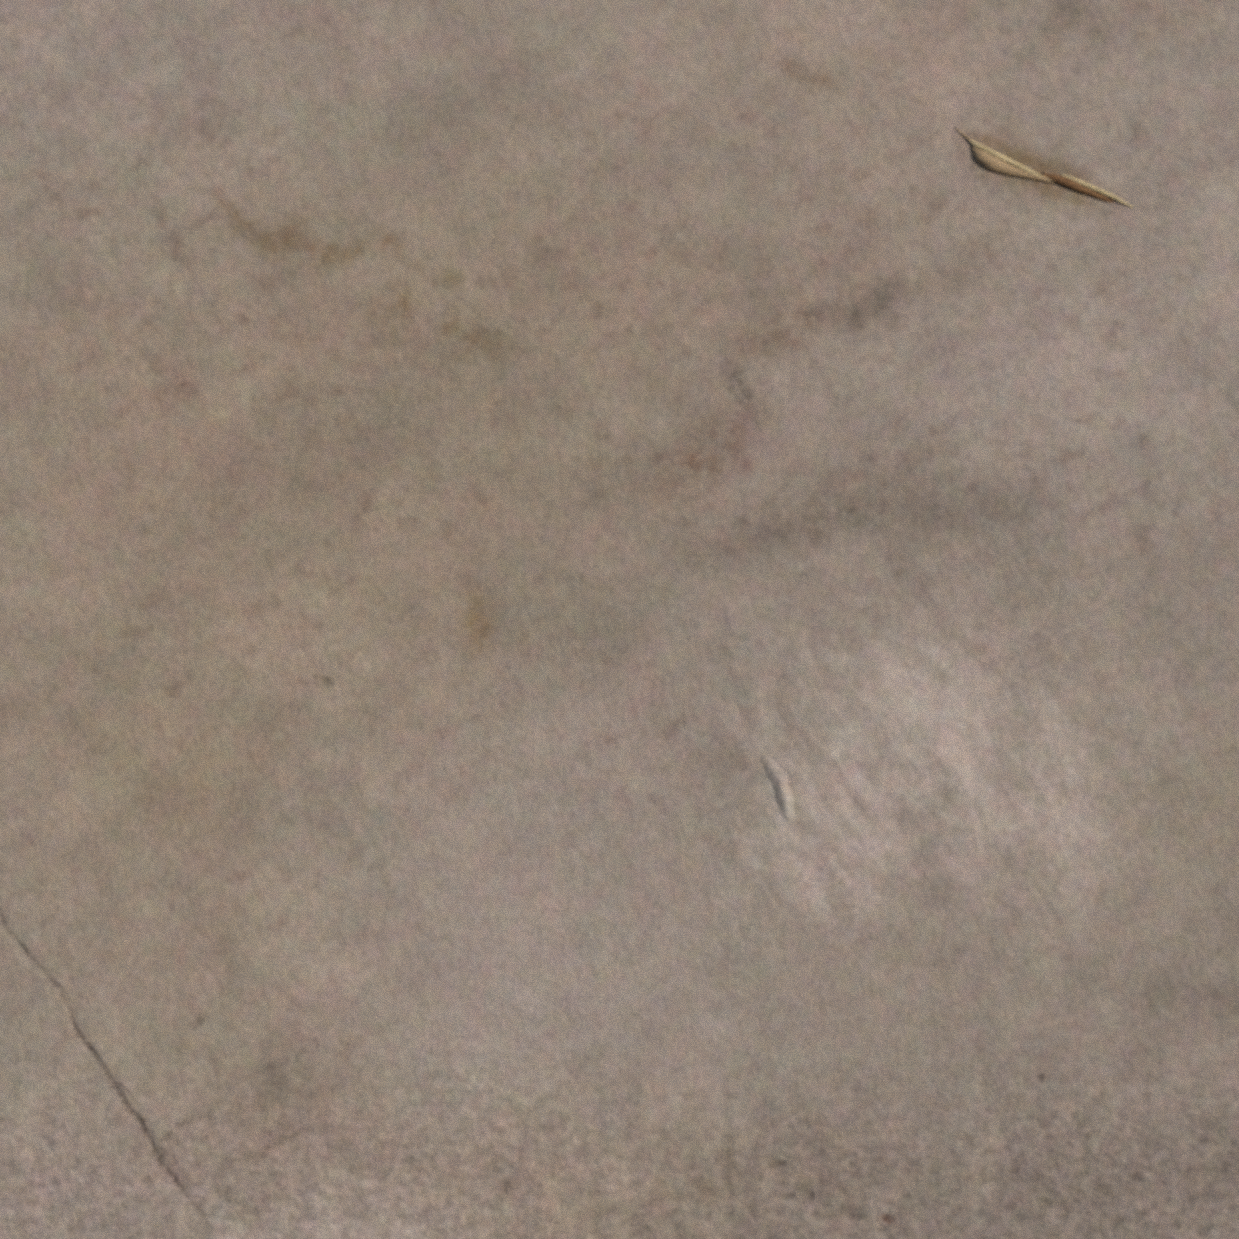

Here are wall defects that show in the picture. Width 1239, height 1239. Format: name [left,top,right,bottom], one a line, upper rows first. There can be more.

crack [0,903,213,1228]